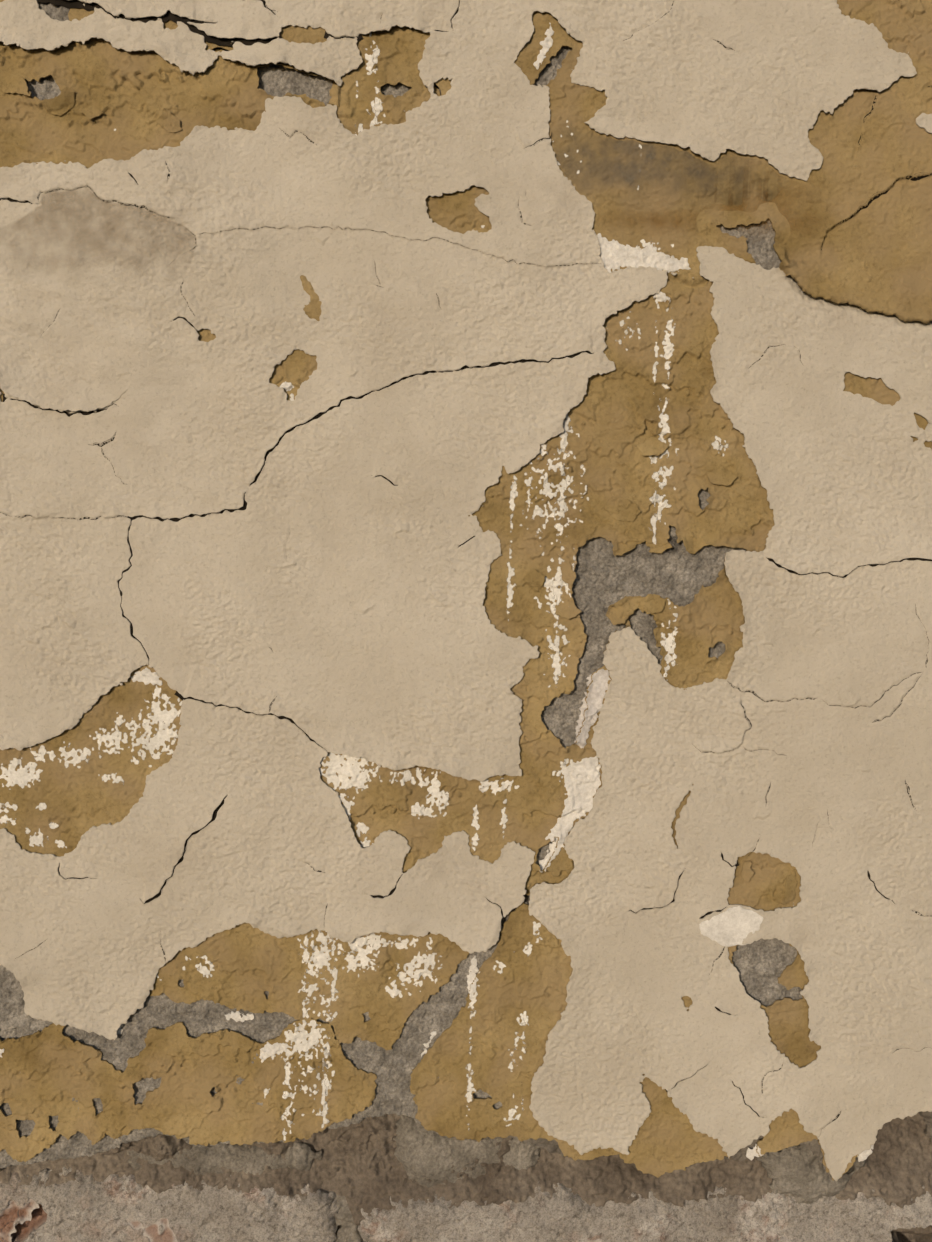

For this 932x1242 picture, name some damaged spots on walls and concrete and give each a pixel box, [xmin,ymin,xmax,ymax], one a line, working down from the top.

peeling [0,25,452,169]
crack [0,161,601,328]
crack [821,172,931,250]
crack [0,351,593,659]
peeling [319,0,932,895]
crack [766,557,932,578]
peeling [0,665,182,857]
crack [174,691,323,748]
crack [144,796,227,904]
peeling [727,852,801,911]
peeling [0,902,730,1178]
peeling [728,938,821,1068]